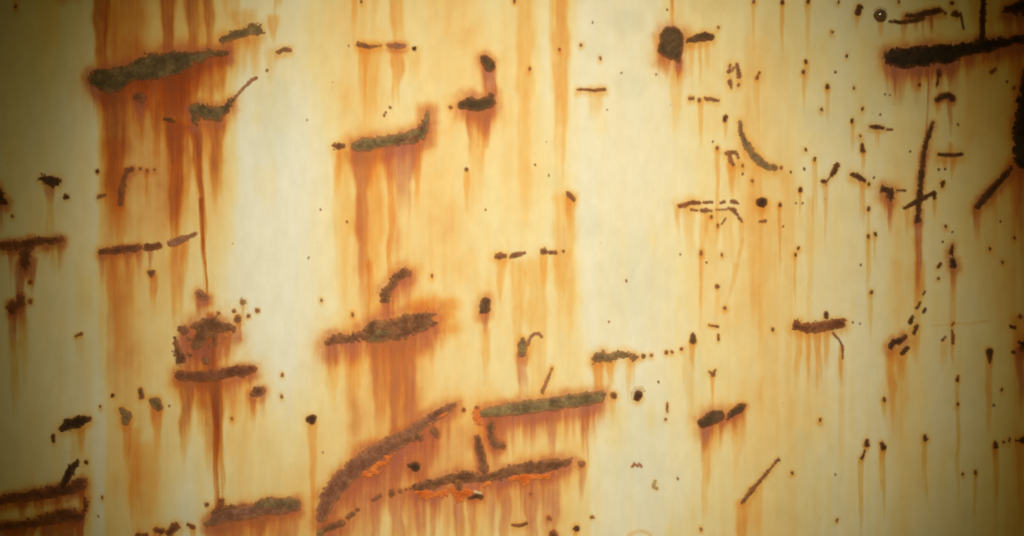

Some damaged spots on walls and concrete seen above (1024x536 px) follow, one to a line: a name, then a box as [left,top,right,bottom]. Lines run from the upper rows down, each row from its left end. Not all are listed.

rust [88,22,266,104]
rust [658,26,720,63]
rust [882,0,1024,102]
rust [331,111,431,152]
rust [821,121,964,223]
rust [172,297,260,382]
rust [325,311,438,345]
rust [592,332,696,364]
rust [792,311,853,359]
rust [697,403,746,428]
rust [316,390,617,536]
rust [135,496,301,536]